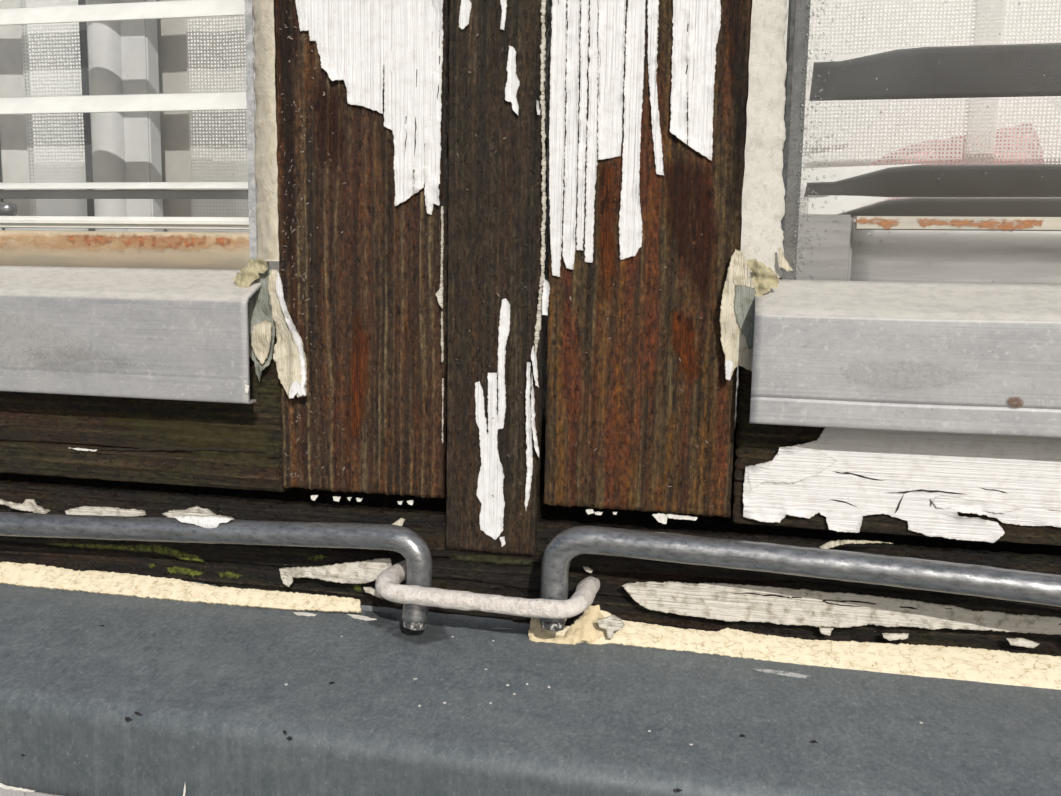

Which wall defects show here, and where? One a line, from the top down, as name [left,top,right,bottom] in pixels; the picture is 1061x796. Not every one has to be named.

peeling [505,46,520,115]
peeling [295,0,444,362]
rust [19,234,249,249]
peeling [525,0,721,512]
rust [856,218,898,229]
rust [919,218,1042,230]
peeling [475,299,511,547]
peeling [162,506,234,528]
peeling [743,427,1061,549]
crack [833,471,1006,513]
peeling [279,558,392,599]
peeling [622,581,1061,648]